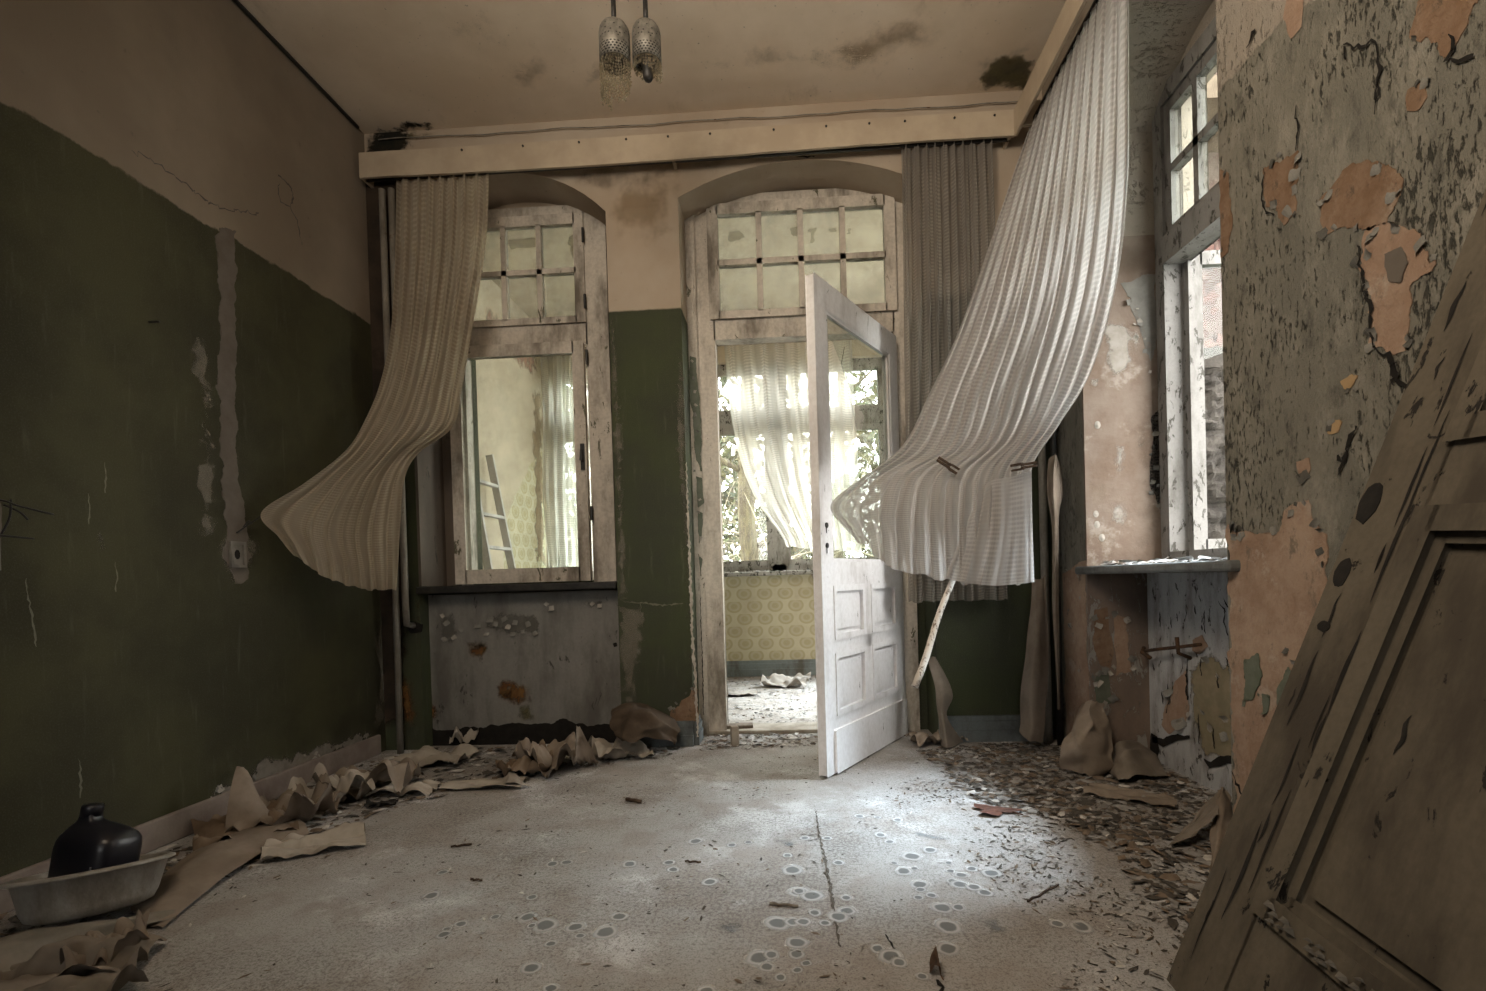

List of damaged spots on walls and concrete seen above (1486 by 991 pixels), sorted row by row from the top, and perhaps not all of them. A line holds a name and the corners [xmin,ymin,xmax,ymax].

spalling [1316,160,1437,355]
peeling [192,338,211,403]
peeling [1120,274,1157,373]
peeling [198,424,215,533]
peeling [1148,411,1161,514]
spalling [1062,458,1329,813]
corrosion [498,681,532,719]